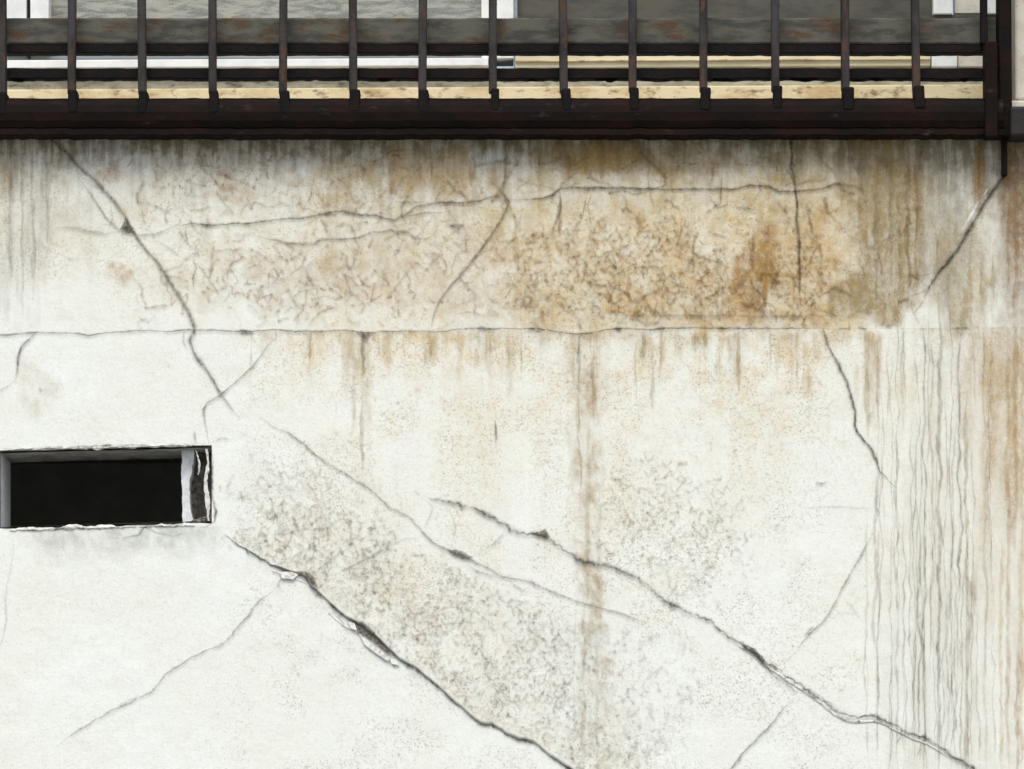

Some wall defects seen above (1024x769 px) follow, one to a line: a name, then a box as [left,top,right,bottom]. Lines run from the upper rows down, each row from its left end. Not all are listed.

corrosion [578,140,923,324]
crack [727,142,840,305]
crack [904,177,1004,301]
corrosion [935,231,991,333]
crack [830,349,878,464]
spalling [280,572,318,588]
crack [245,548,409,667]
spalling [348,620,399,665]
crack [704,617,974,769]